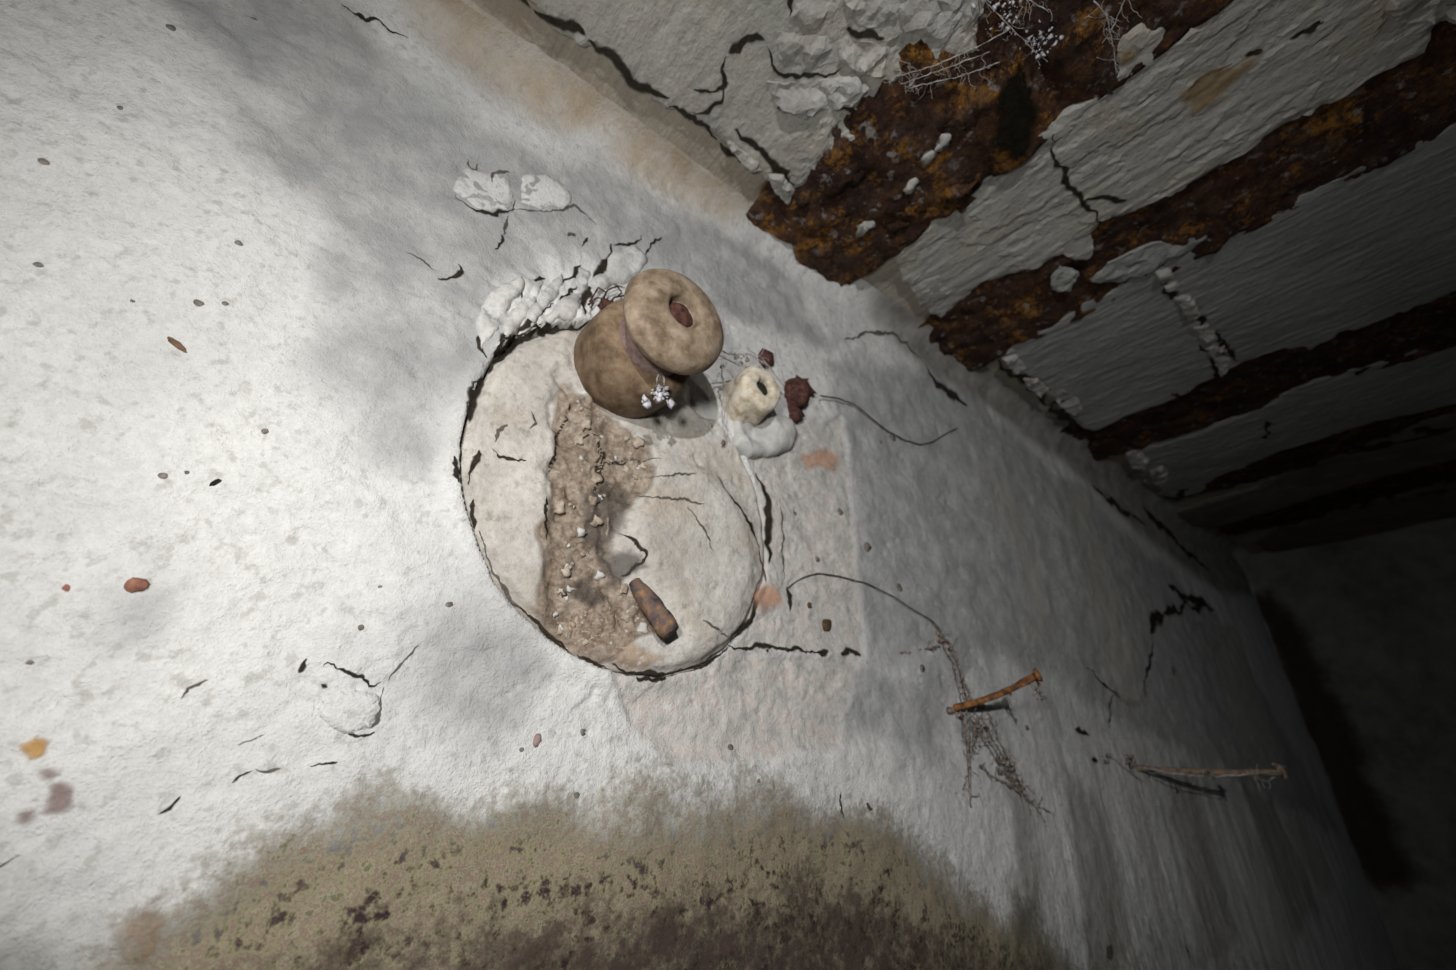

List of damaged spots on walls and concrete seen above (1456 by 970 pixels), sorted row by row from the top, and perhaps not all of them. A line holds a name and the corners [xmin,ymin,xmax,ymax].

spalling [767,0,968,120]
corrosion [994,70,1038,160]
corrosion [1183,62,1252,113]
spalling [727,139,795,205]
crack [407,252,464,280]
spalling [1050,235,1232,377]
crack [452,160,861,682]
corrosion [758,348,774,369]
corrosion [803,451,837,468]
spalling [1003,354,1083,416]
crack [1075,485,1214,763]
damp [459,870,1003,970]